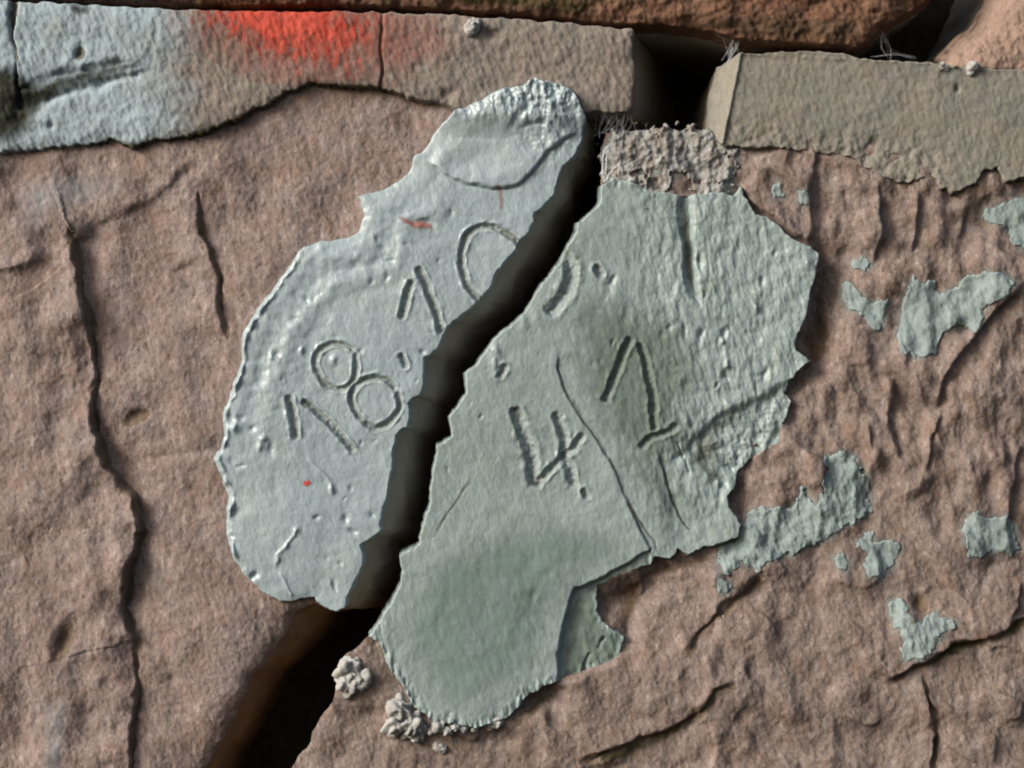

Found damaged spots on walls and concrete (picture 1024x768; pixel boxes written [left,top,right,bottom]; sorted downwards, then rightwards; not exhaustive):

crack [195,190,230,339]
spalling [795,265,845,374]
crack [66,225,149,768]
crack [205,118,599,768]
crack [557,358,657,559]
crack [888,618,1024,768]